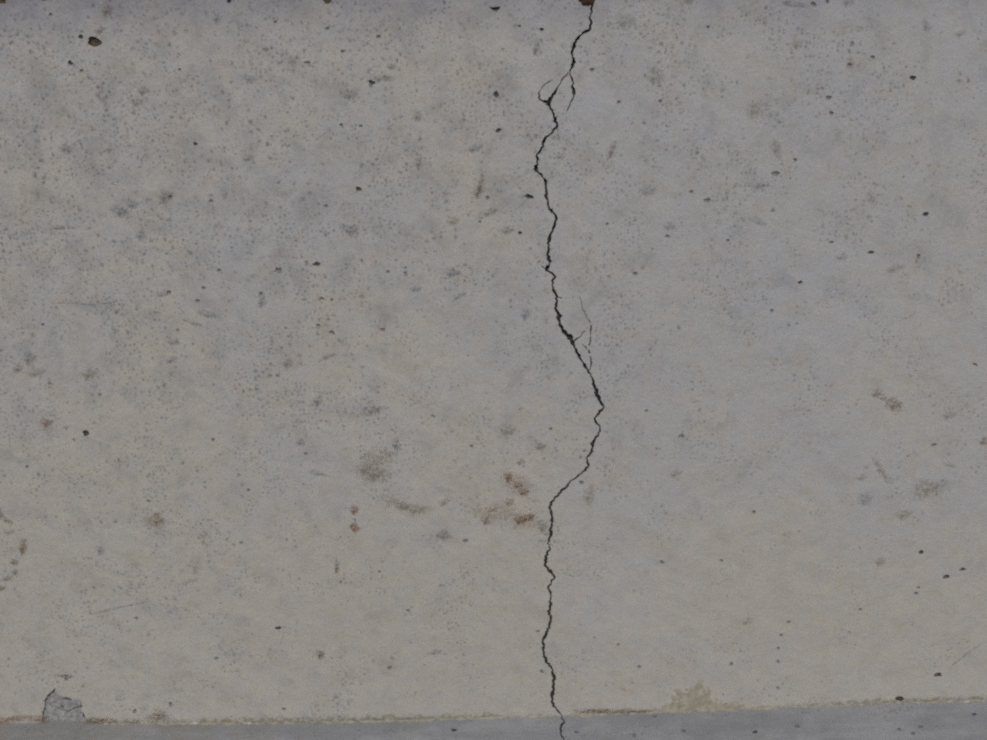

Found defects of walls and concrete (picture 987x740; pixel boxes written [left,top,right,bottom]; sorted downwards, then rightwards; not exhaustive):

crack [534,6,605,740]